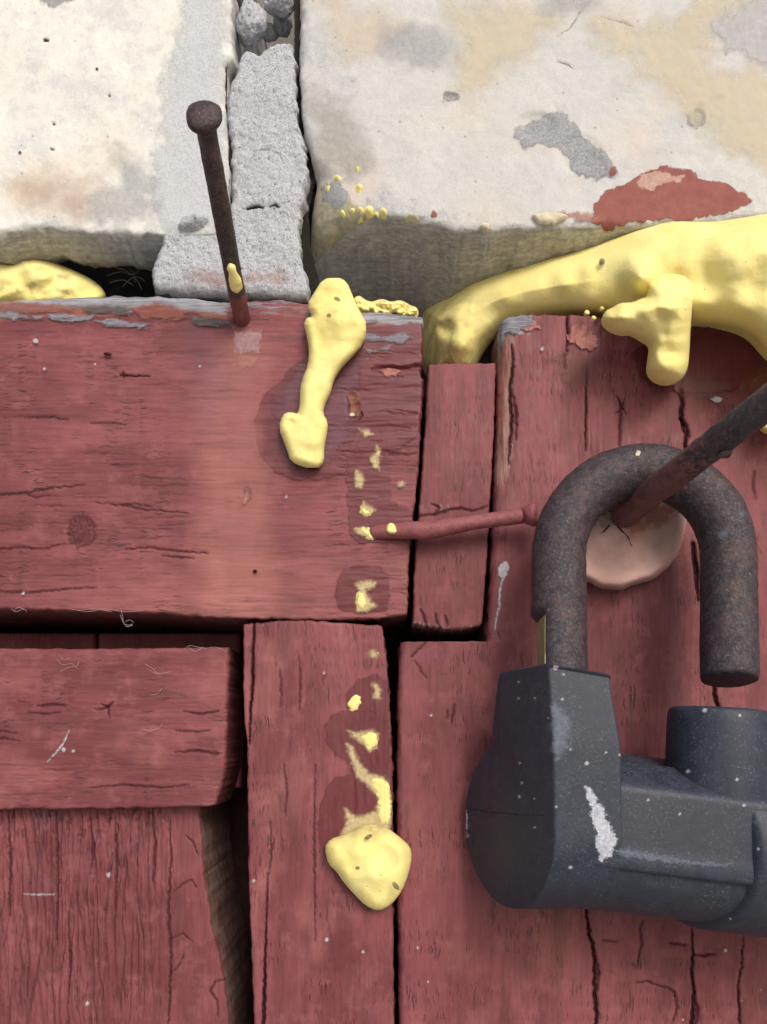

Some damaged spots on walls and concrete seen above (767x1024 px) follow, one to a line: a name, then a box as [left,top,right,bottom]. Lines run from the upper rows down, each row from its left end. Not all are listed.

spalling [514,113,618,181]
peeling [637,171,685,191]
peeling [0,302,229,329]
peeling [567,323,598,351]
damp [254,322,424,543]
crack [508,344,517,464]
crack [679,392,688,448]
rust [707,450,733,461]
damp [335,564,390,613]
damp [318,674,391,912]
crack [585,909,611,1024]
crack [638,921,711,1024]